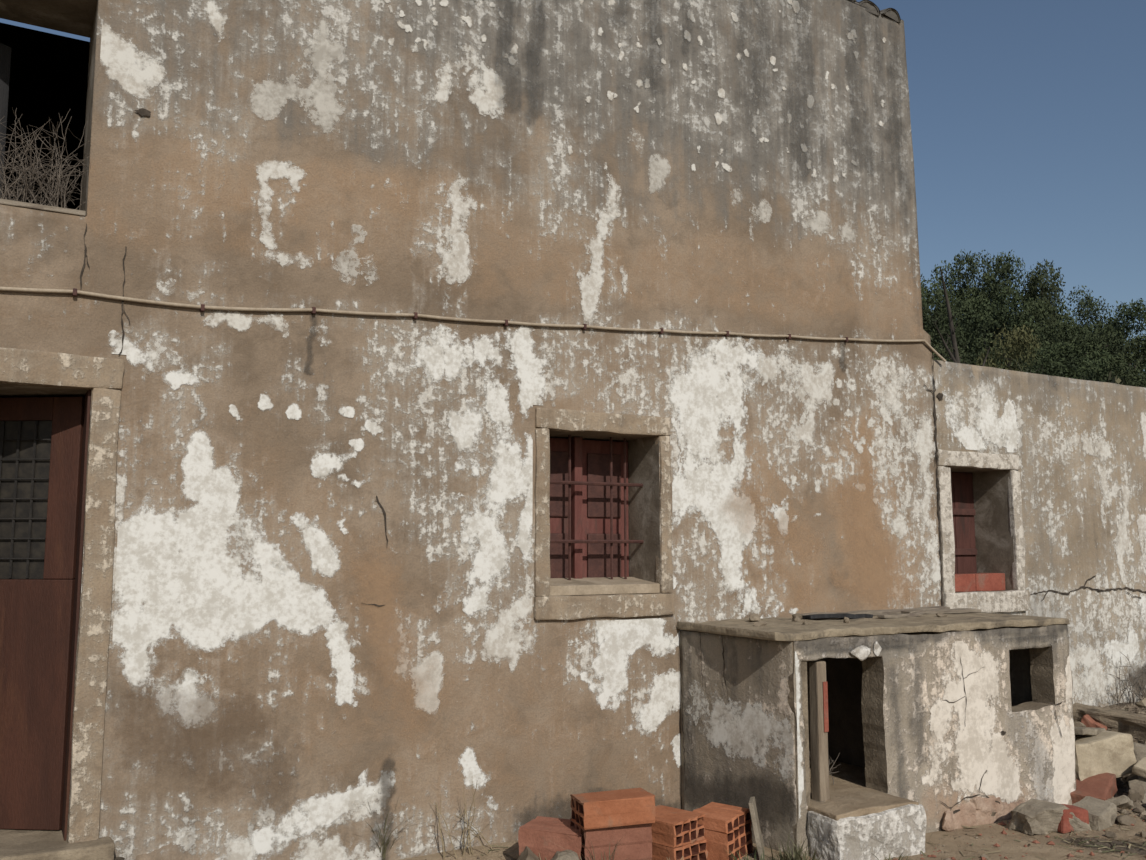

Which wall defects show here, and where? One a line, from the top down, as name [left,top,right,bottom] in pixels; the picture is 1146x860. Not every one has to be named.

peeling [112,431,361,729]
peeling [258,394,301,420]
peeling [311,406,383,488]
peeling [396,324,547,714]
peeling [669,336,941,618]
peeling [937,385,1020,453]
crack [1030,575,1146,600]
peeling [1066,430,1146,585]
peeling [165,769,396,860]
peeling [580,618,804,818]
peeling [917,641,1025,832]
peeling [1047,593,1146,805]